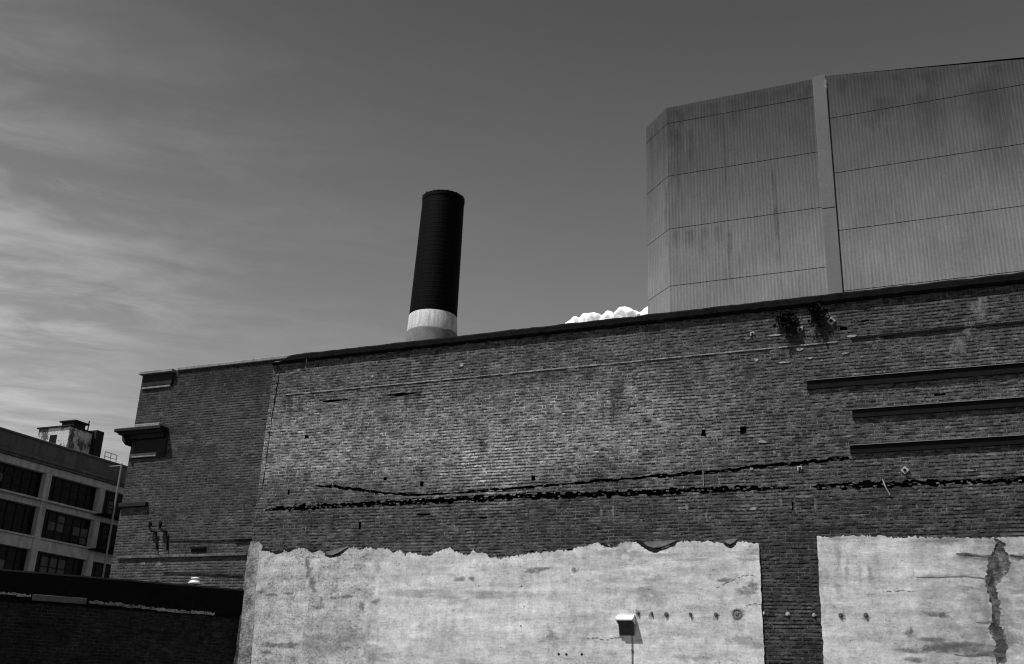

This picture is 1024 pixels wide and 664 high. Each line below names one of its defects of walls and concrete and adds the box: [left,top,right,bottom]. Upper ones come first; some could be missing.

crack [262,373,1024,512]
flaking render [636,540,678,553]
crack [886,539,1024,664]